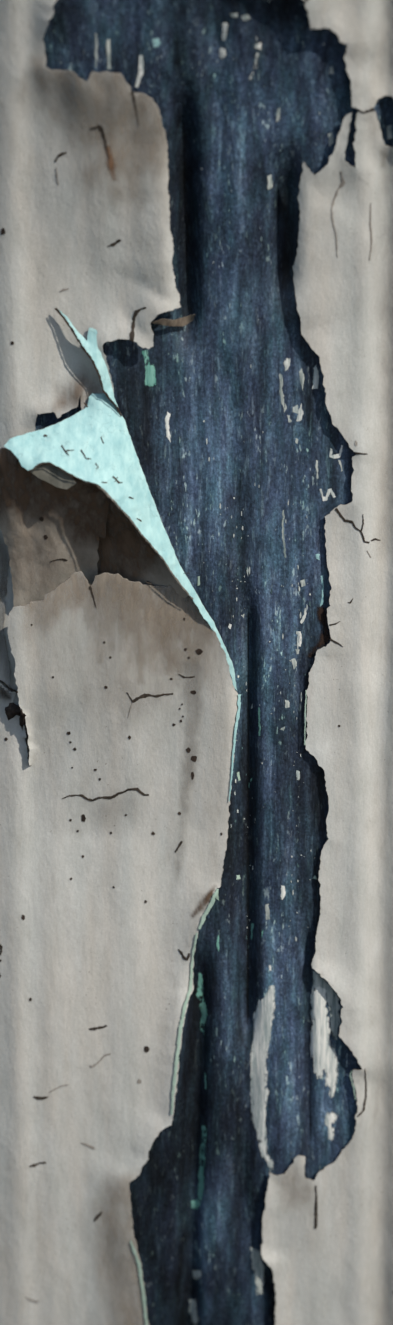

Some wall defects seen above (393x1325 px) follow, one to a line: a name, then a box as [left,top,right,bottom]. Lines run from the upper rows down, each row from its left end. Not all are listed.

peeling [374,96,393,147]
peeling [35,395,81,431]
crack [335,508,381,558]
damp [30,573,210,641]
crack [0,680,30,760]
crack [127,674,195,717]
crack [62,788,149,801]
peeling [312,970,343,1040]
peeling [310,985,338,1098]
peeling [250,985,275,1169]
peeling [191,1147,205,1209]
peeling [250,1247,265,1294]